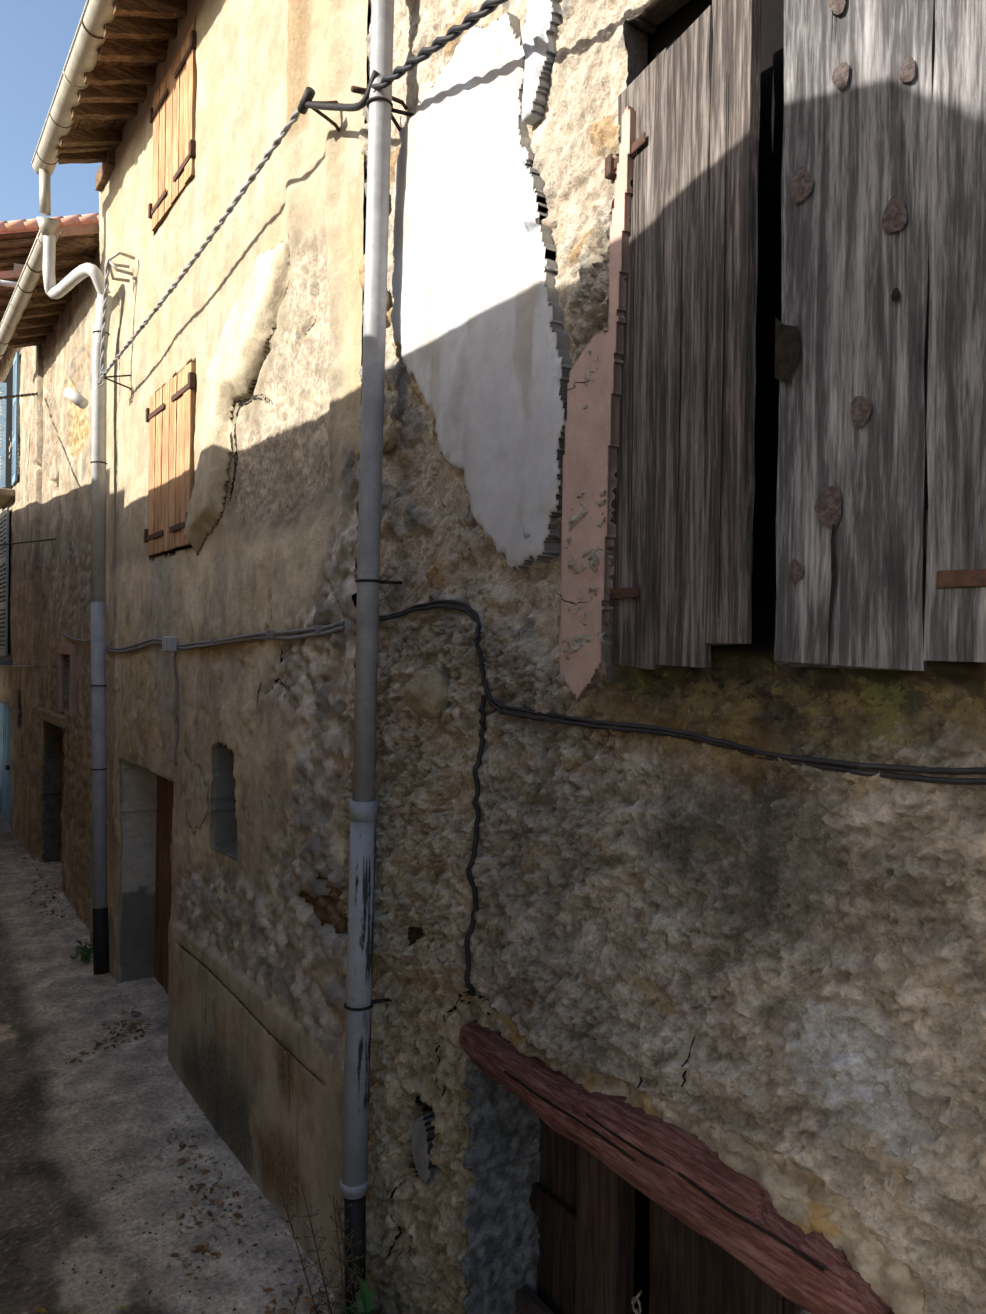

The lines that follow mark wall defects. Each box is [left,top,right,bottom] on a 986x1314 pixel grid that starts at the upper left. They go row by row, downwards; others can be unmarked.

flaking render [390,0,573,570]
crack [177,943,325,1104]